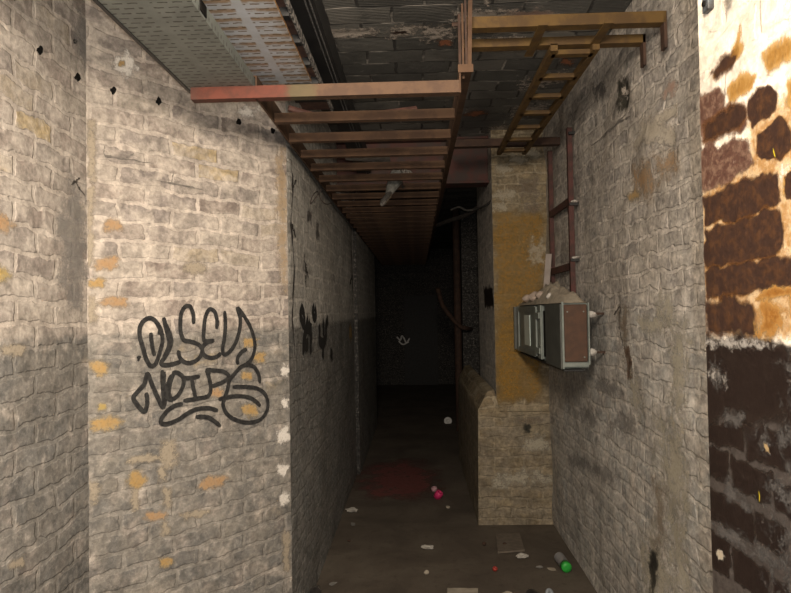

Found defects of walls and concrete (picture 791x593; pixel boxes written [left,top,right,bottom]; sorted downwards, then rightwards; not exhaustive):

rust [275,147,288,292]